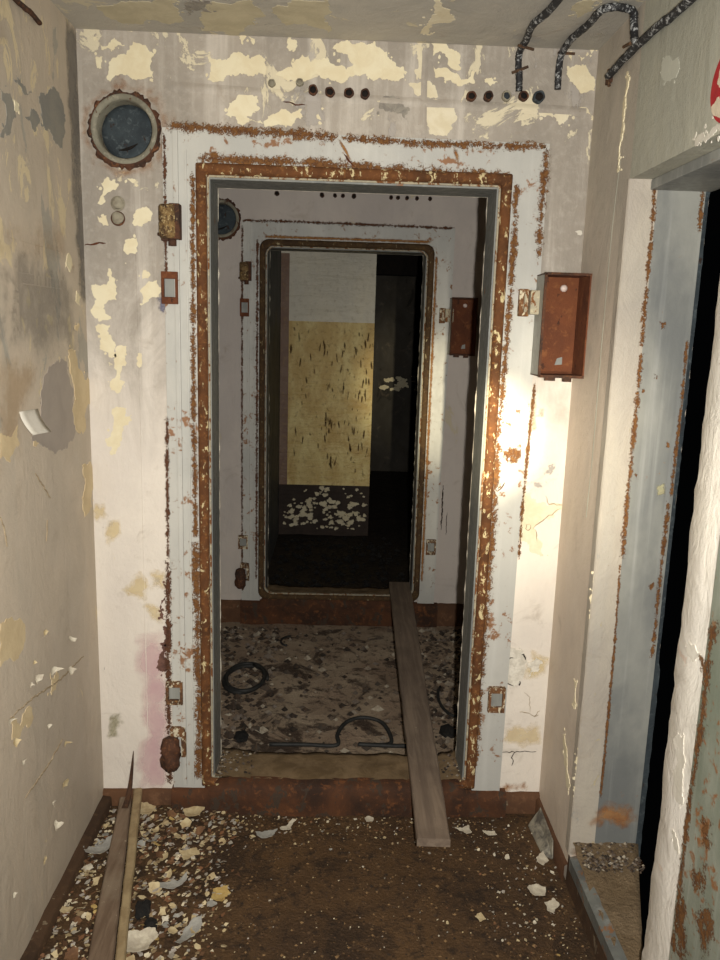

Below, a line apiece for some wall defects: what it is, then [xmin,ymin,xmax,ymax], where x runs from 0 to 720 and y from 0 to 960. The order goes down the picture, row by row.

peeling [93,0,497,136]
peeling [567,50,597,94]
peeling [90,268,142,393]
peeling [97,177,138,226]
peeling [123,207,153,264]
peeling [139,270,161,305]
flaking render [0,345,90,462]
peeling [82,462,94,517]
corrosion [162,121,550,789]
corrosion [597,190,657,826]
corrosion [649,340,689,658]
corrosion [670,622,720,960]